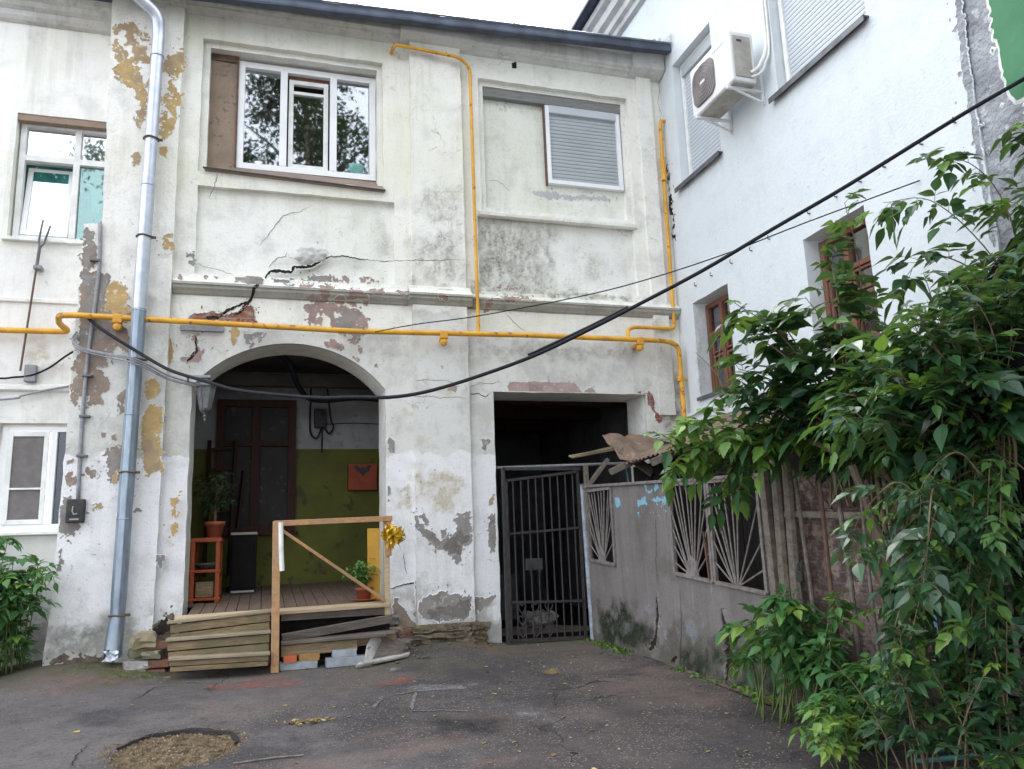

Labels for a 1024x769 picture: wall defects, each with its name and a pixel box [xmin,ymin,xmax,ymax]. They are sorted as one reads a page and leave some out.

peeling [109,22,190,158]
spalling [947,0,1002,247]
flaking render [68,227,132,416]
crack [199,206,459,318]
peeling [271,270,411,363]
peeling [137,377,169,480]
spalling [506,374,596,393]
flaking render [55,431,122,572]
peeling [155,491,182,569]
flaking render [410,489,497,566]
flaking render [391,584,497,628]
crack [648,523,682,663]